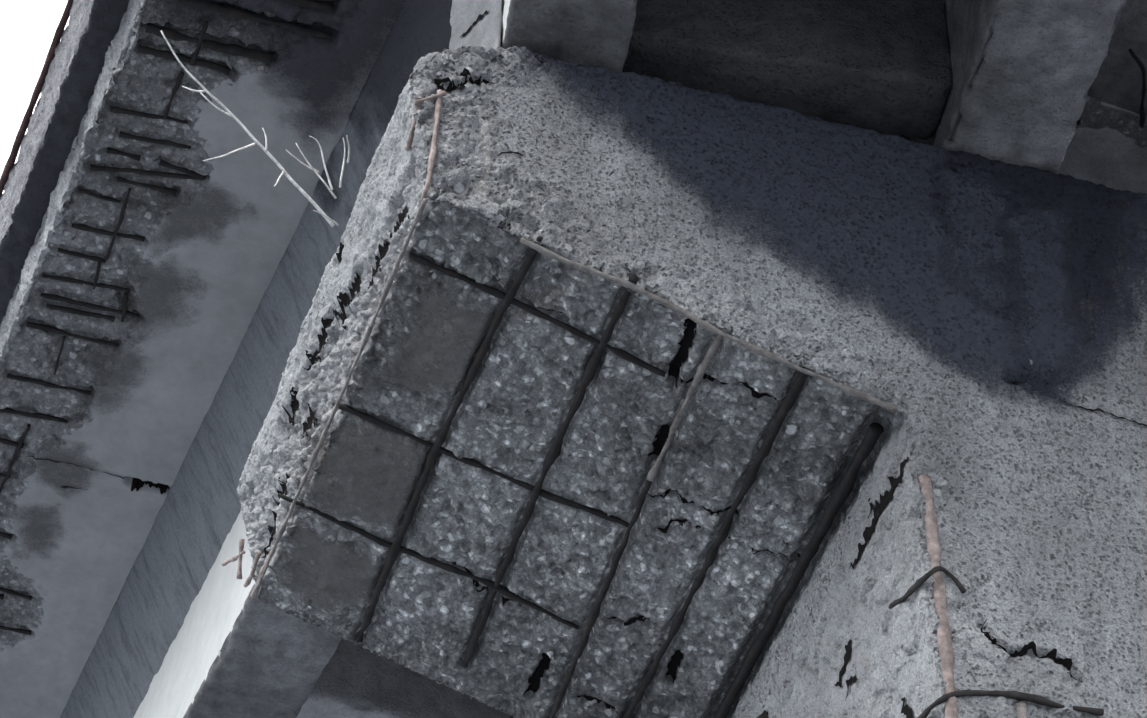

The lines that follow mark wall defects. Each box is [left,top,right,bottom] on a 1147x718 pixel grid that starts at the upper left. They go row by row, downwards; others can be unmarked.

water stain [158,188,236,243]
water stain [81,262,192,408]
spalling [0,0,334,652]
spalling [221,45,1106,718]
crack [28,456,127,489]
crack [648,489,800,557]
crack [608,615,649,626]
crack [981,620,1082,680]
crack [577,695,635,714]